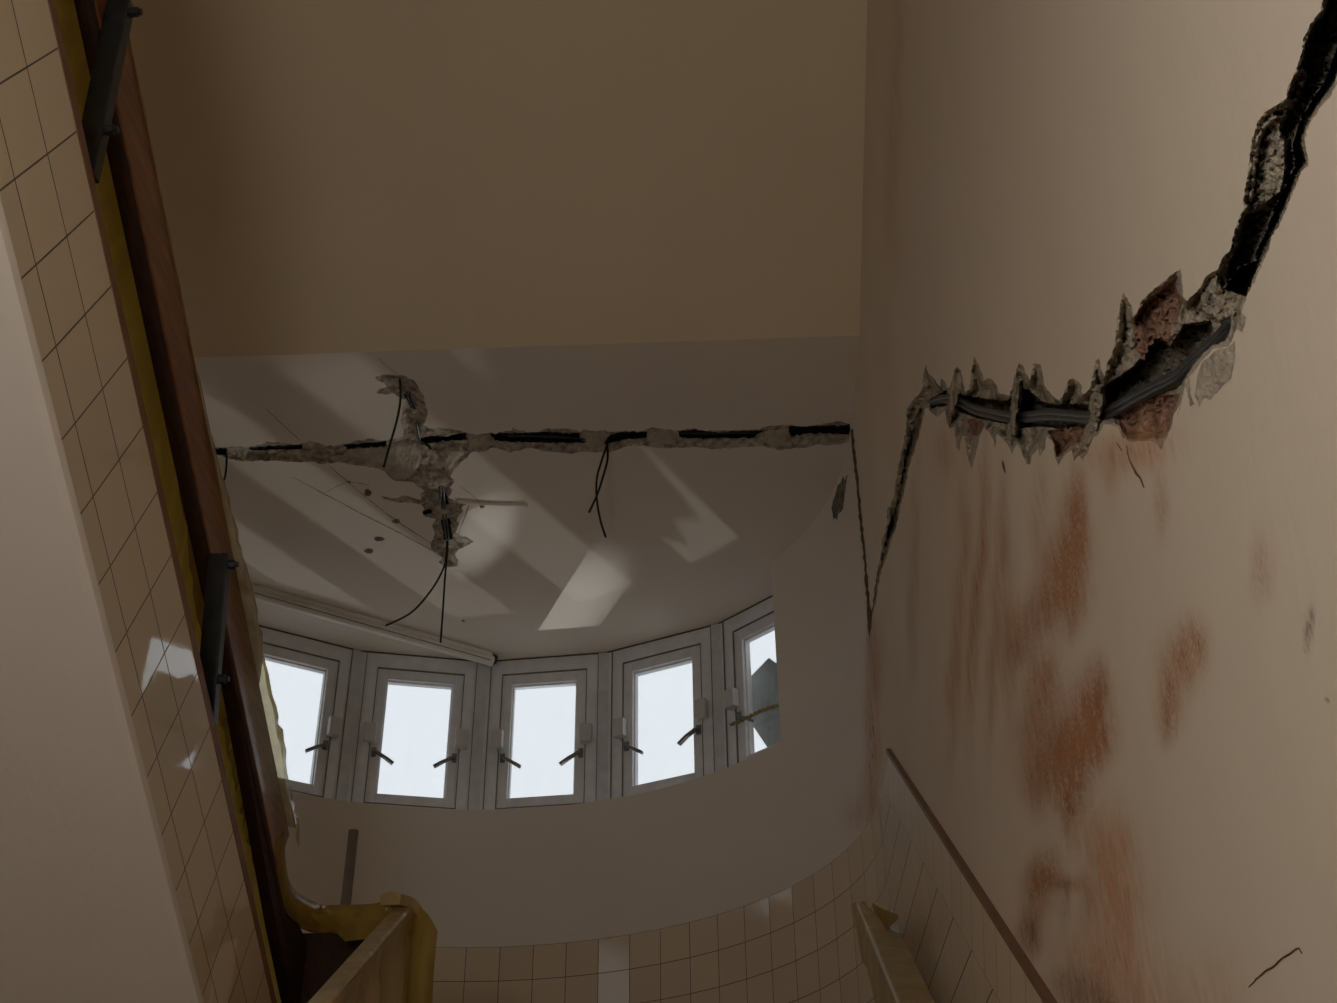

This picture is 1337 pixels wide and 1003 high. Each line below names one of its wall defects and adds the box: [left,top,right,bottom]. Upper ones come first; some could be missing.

flaking render [1248,68,1307,203]
peeling [1185,312,1245,407]
flaking render [831,476,847,520]